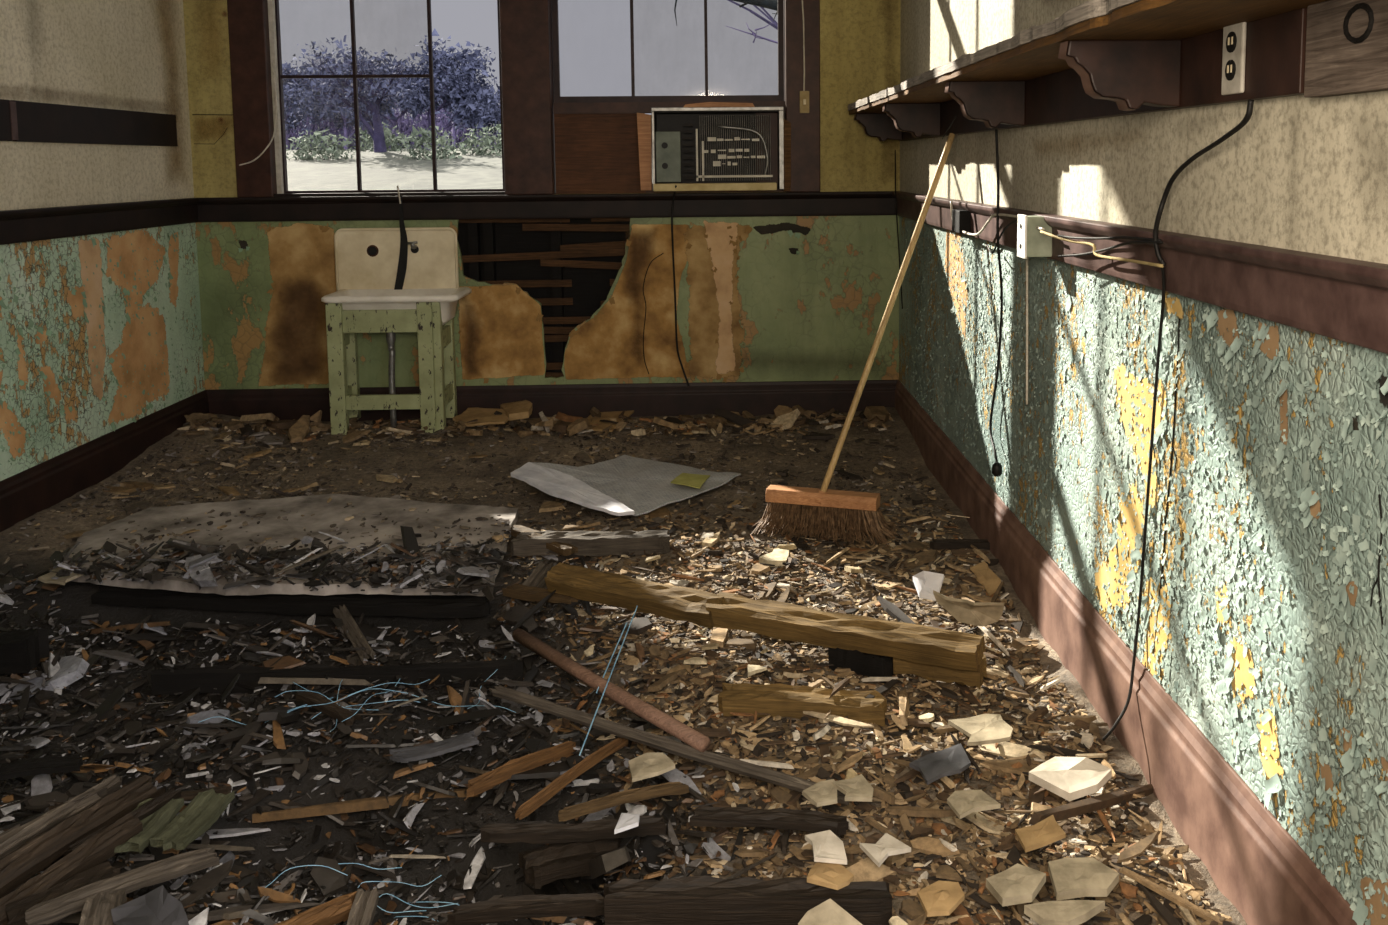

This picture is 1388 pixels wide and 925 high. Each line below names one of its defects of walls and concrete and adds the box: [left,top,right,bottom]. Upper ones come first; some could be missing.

peeling [0,227,189,475]
peeling [259,223,336,388]
leakage [279,285,322,376]
flaking render [458,284,545,383]
flaking render [564,220,753,383]